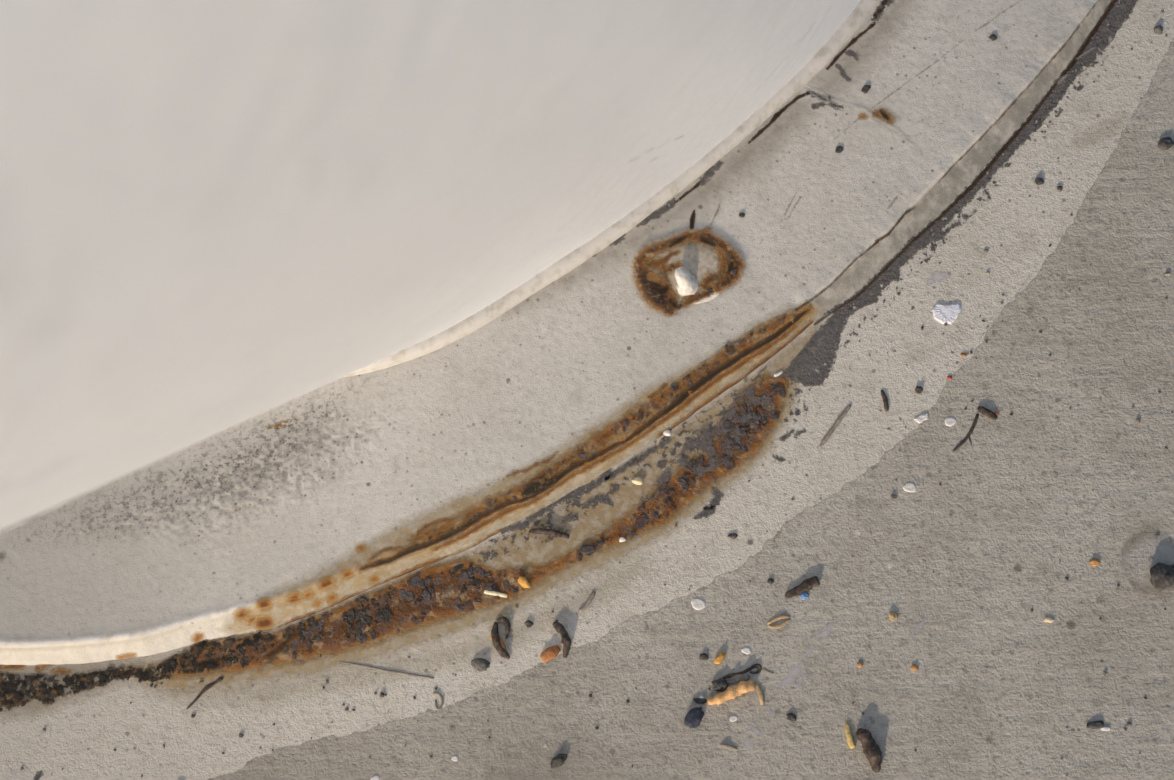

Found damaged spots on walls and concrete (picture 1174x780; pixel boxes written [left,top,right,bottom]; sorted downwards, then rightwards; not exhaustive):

rust [633,214,745,316]
peeling [778,0,1138,441]
rust [117,306,816,689]